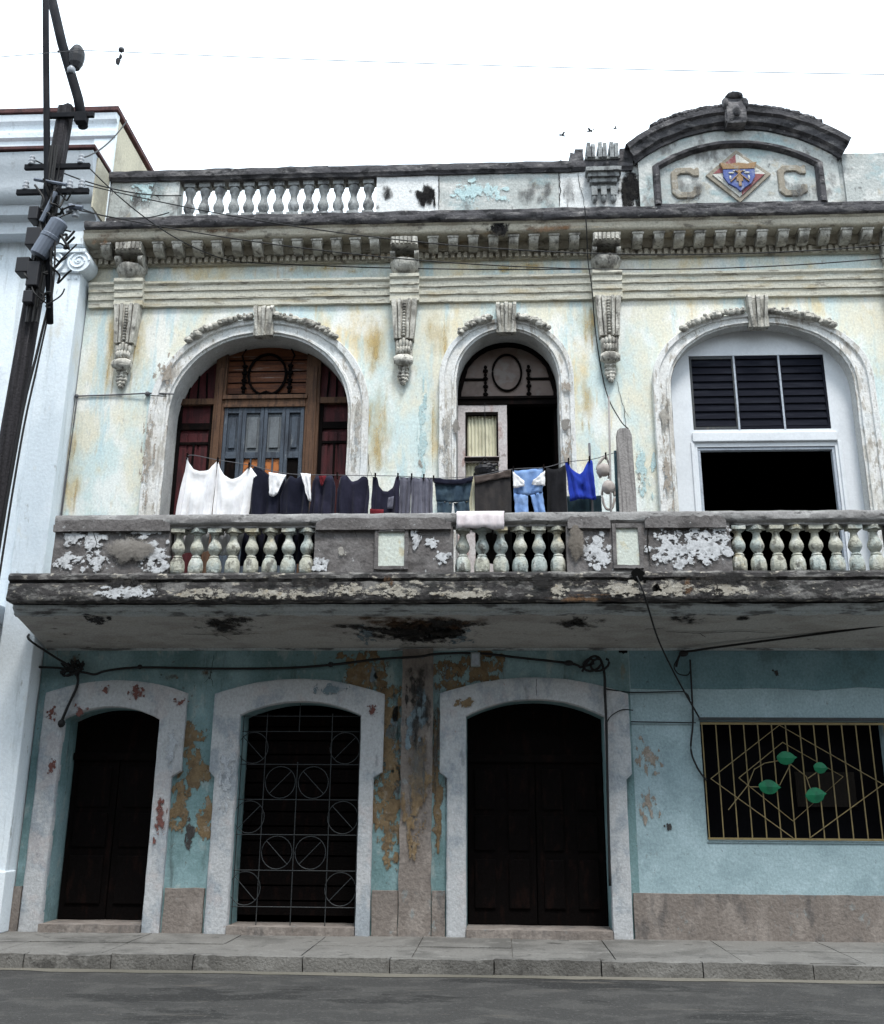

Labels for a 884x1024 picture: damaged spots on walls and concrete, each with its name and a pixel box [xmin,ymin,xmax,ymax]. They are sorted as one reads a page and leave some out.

leakage [415,185,436,206]
peeling [450,177,510,202]
peeling [52,531,170,573]
peeling [583,526,750,598]
spalling [93,585,156,599]
leakage [196,614,262,634]
leakage [336,618,487,644]
peeling [313,650,505,872]
peeling [635,736,663,776]
peeling [153,720,212,851]
peeling [637,790,672,831]